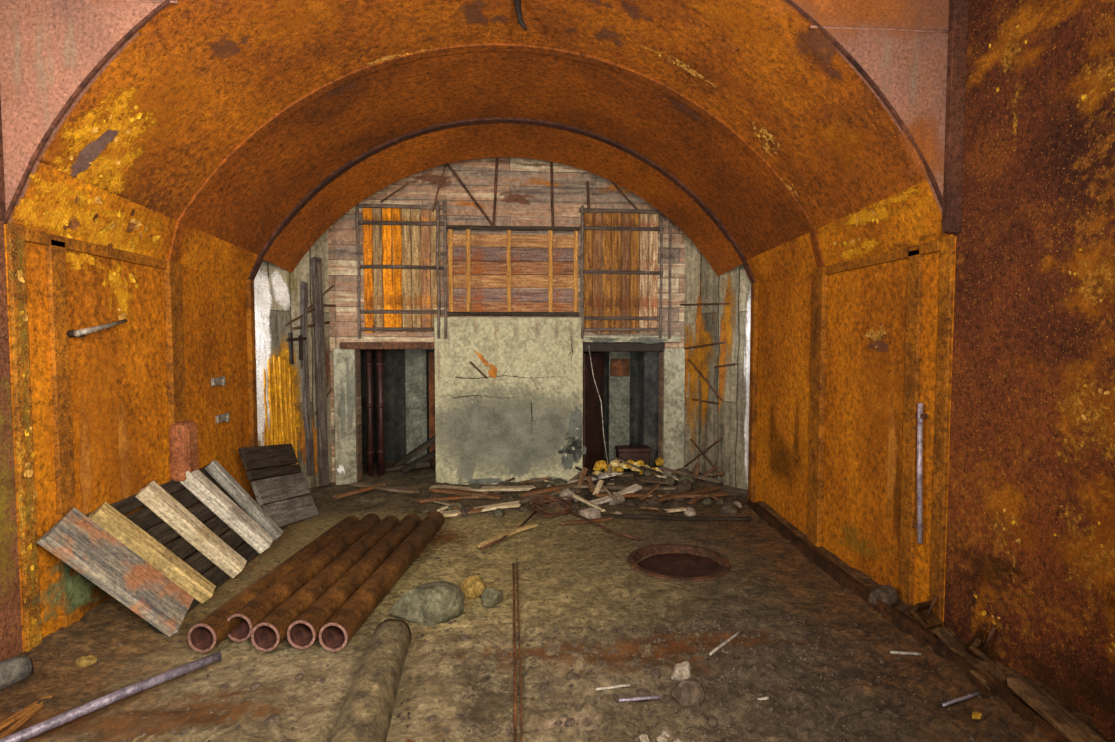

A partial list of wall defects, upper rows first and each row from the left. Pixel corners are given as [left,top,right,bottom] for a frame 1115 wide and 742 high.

corrosion [801,0,926,28]
corrosion [981,0,1080,73]
corrosion [1076,60,1115,113]
peeling [11,88,169,329]
corrosion [1065,249,1115,316]
corrosion [684,275,733,440]
peeling [24,451,35,478]
corrosion [868,371,899,515]
corrosion [1056,366,1115,464]
corrosion [984,486,1033,567]
corrosion [1054,490,1115,612]
corrosion [974,586,1002,632]